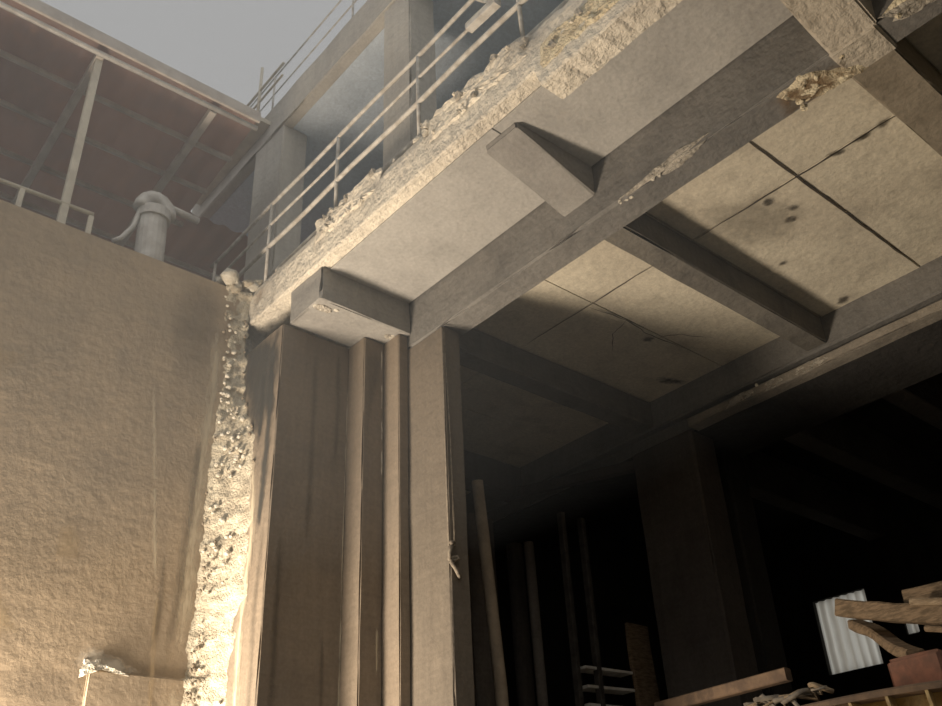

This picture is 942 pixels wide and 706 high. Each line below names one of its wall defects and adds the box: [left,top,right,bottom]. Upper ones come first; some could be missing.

spalling [877,0,936,22]
spalling [419,0,619,144]
spalling [776,55,868,111]
spalling [314,168,382,245]
spalling [618,132,710,204]
crack [699,116,917,266]
water stain [245,334,278,524]
spalling [171,289,255,706]
spalling [78,655,129,678]